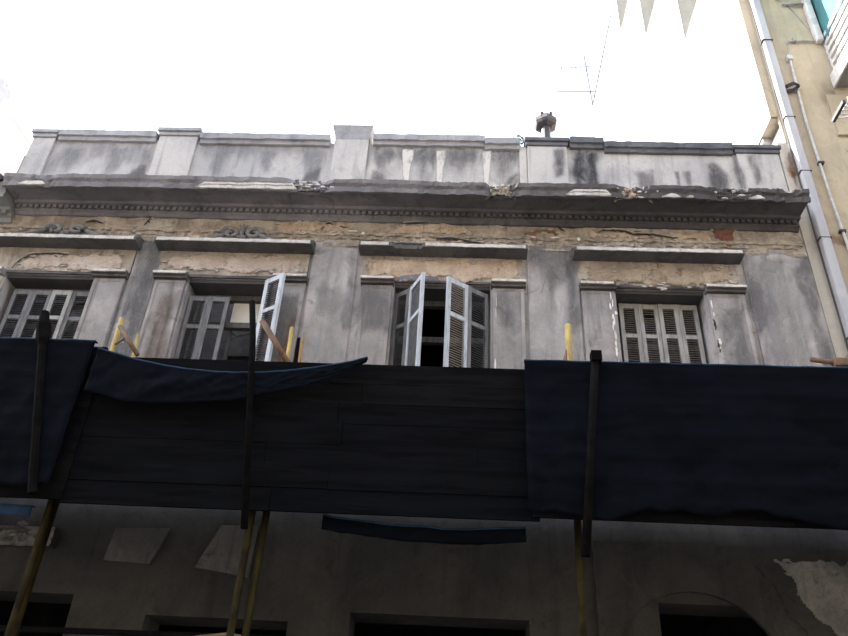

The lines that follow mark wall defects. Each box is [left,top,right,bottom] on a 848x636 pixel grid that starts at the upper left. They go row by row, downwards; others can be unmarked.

leakage [303,155,320,181]
leakage [402,149,414,180]
leakage [436,150,445,182]
leakage [482,151,491,185]
leakage [573,151,598,184]
leakage [709,164,727,188]
spalling [389,223,501,244]
spalling [16,252,126,272]
spalling [161,253,303,274]
spalling [366,258,518,284]
spalling [581,264,737,362]
spalling [774,559,848,636]